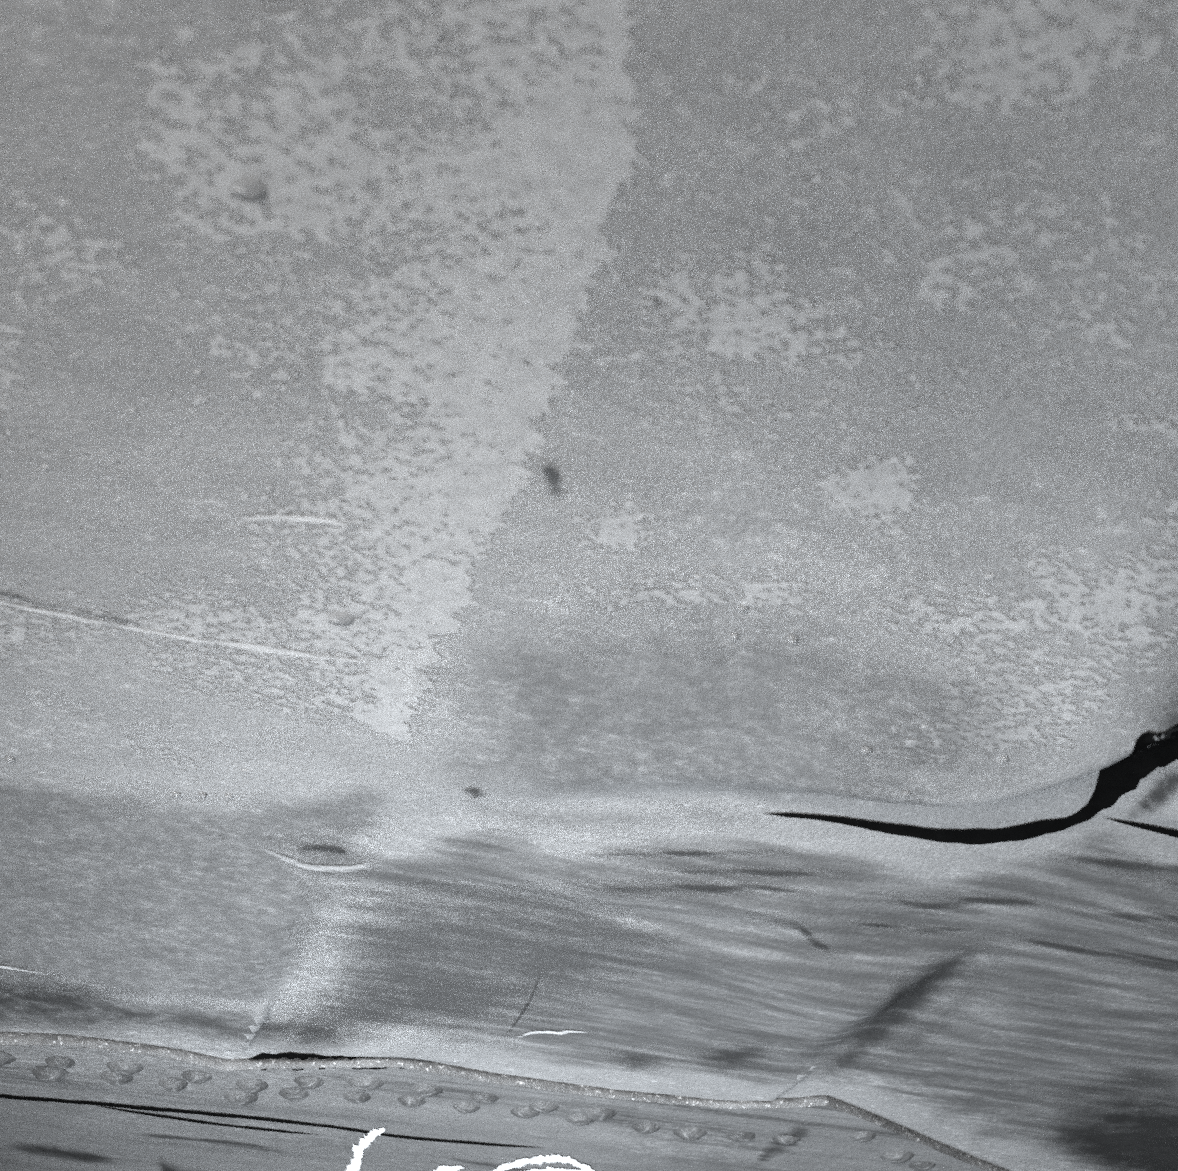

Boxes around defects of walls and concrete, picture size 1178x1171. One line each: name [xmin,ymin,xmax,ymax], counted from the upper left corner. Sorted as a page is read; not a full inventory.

crack [769,724,1178,845]